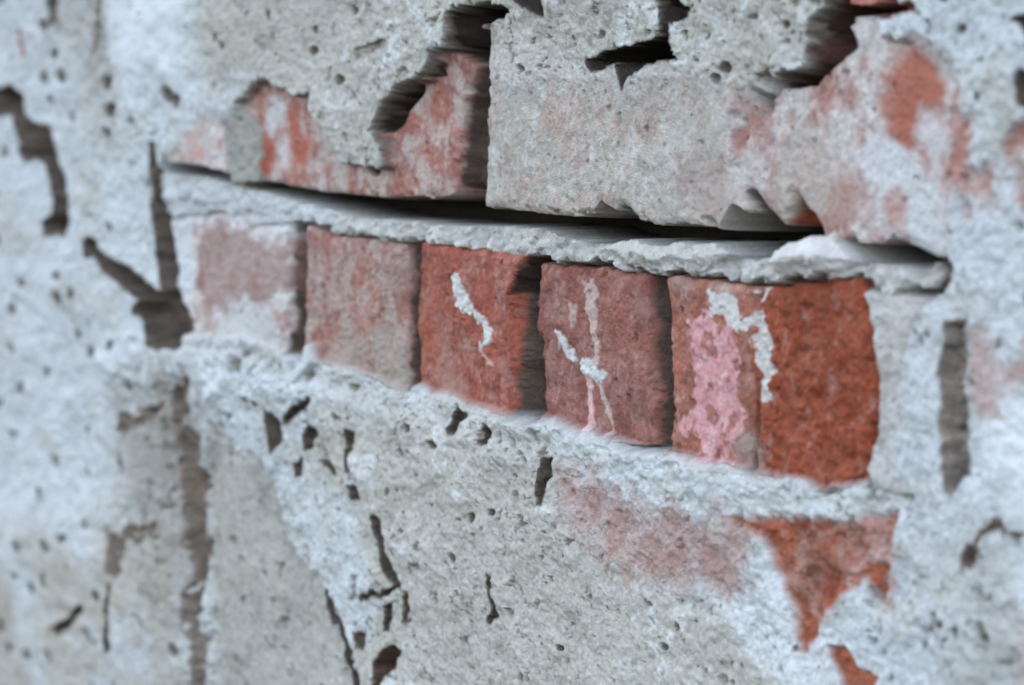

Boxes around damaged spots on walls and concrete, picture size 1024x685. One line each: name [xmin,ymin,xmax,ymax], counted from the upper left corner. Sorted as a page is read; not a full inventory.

crack [48,0,61,31]
crack [91,0,103,53]
crack [0,84,195,351]
spalling [158,0,1024,508]
crack [50,376,215,685]
crack [263,397,412,685]
peeling [551,453,903,658]
crack [959,516,1024,572]
spalling [828,645,888,685]